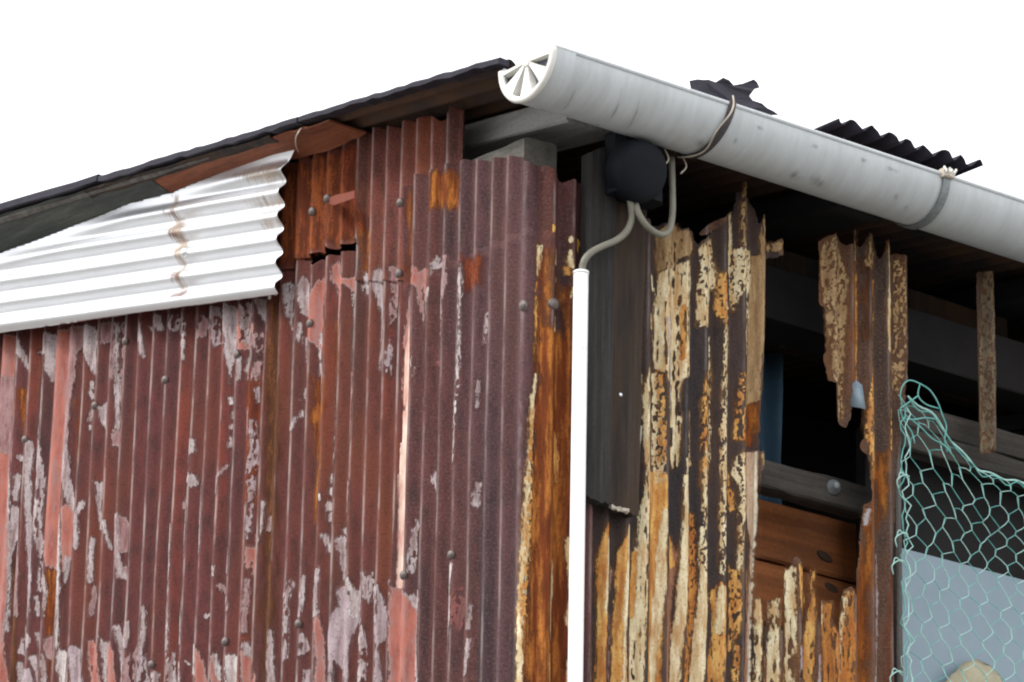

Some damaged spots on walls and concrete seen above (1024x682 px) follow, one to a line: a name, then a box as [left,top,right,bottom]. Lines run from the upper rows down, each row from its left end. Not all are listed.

corrosion [279,145,369,272]
corrosion [429,169,460,209]
corrosion [460,255,482,290]
peeling [0,254,463,682]
corrosion [244,299,280,682]
corrosion [521,250,572,682]
peeling [590,181,856,682]
corrosion [745,402,760,447]
corrosion [9,560,18,682]
corrosion [45,568,57,638]
peeling [448,562,474,677]